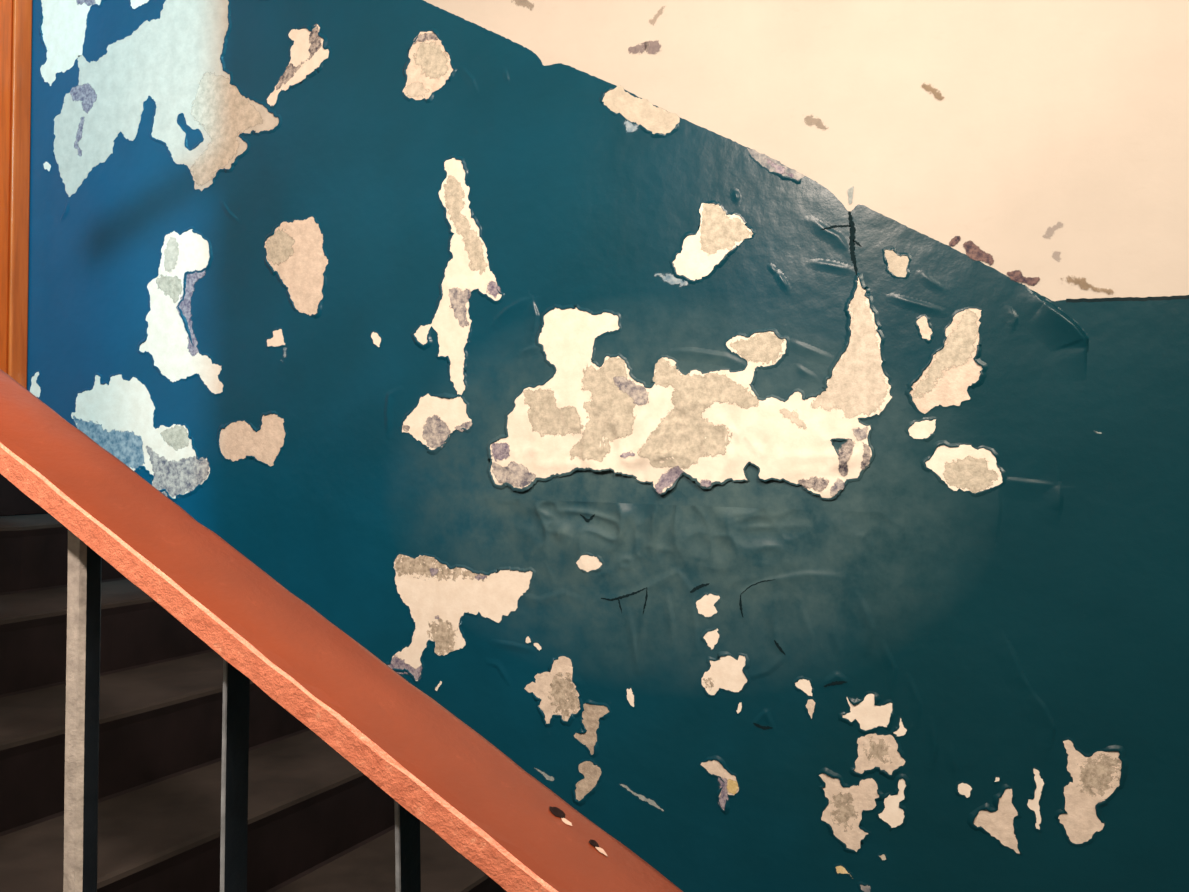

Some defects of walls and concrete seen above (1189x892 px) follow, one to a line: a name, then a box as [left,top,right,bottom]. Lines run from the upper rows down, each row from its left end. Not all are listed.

peeling [39,0,331,198]
peeling [70,372,288,501]
peeling [137,226,225,396]
peeling [265,327,287,362]
peeling [263,215,329,319]
peeling [401,154,505,455]
peeling [655,200,756,287]
peeling [486,273,1007,500]
crack [821,211,862,275]
peeling [385,552,536,684]
peeling [816,691,911,892]
peeling [954,737,1129,856]